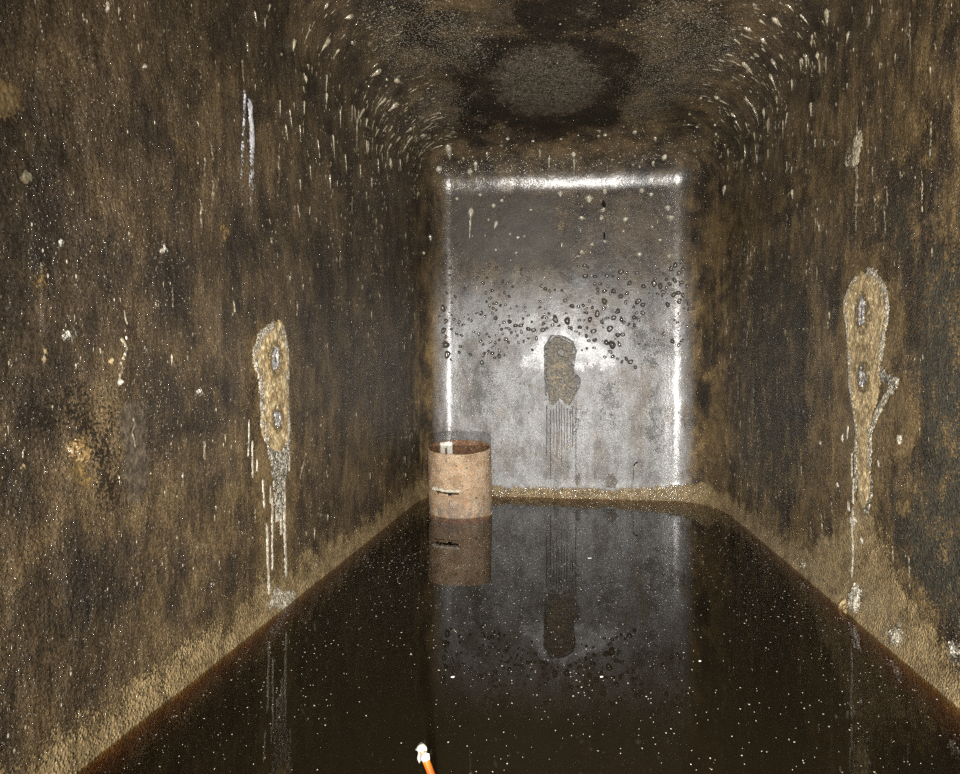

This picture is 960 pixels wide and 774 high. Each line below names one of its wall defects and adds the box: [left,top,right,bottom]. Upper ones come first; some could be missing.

leakage [241,60,255,201]
leakage [359,0,750,144]
corrosion [544,335,581,479]
leakage [492,117,960,759]
leakage [0,473,429,774]